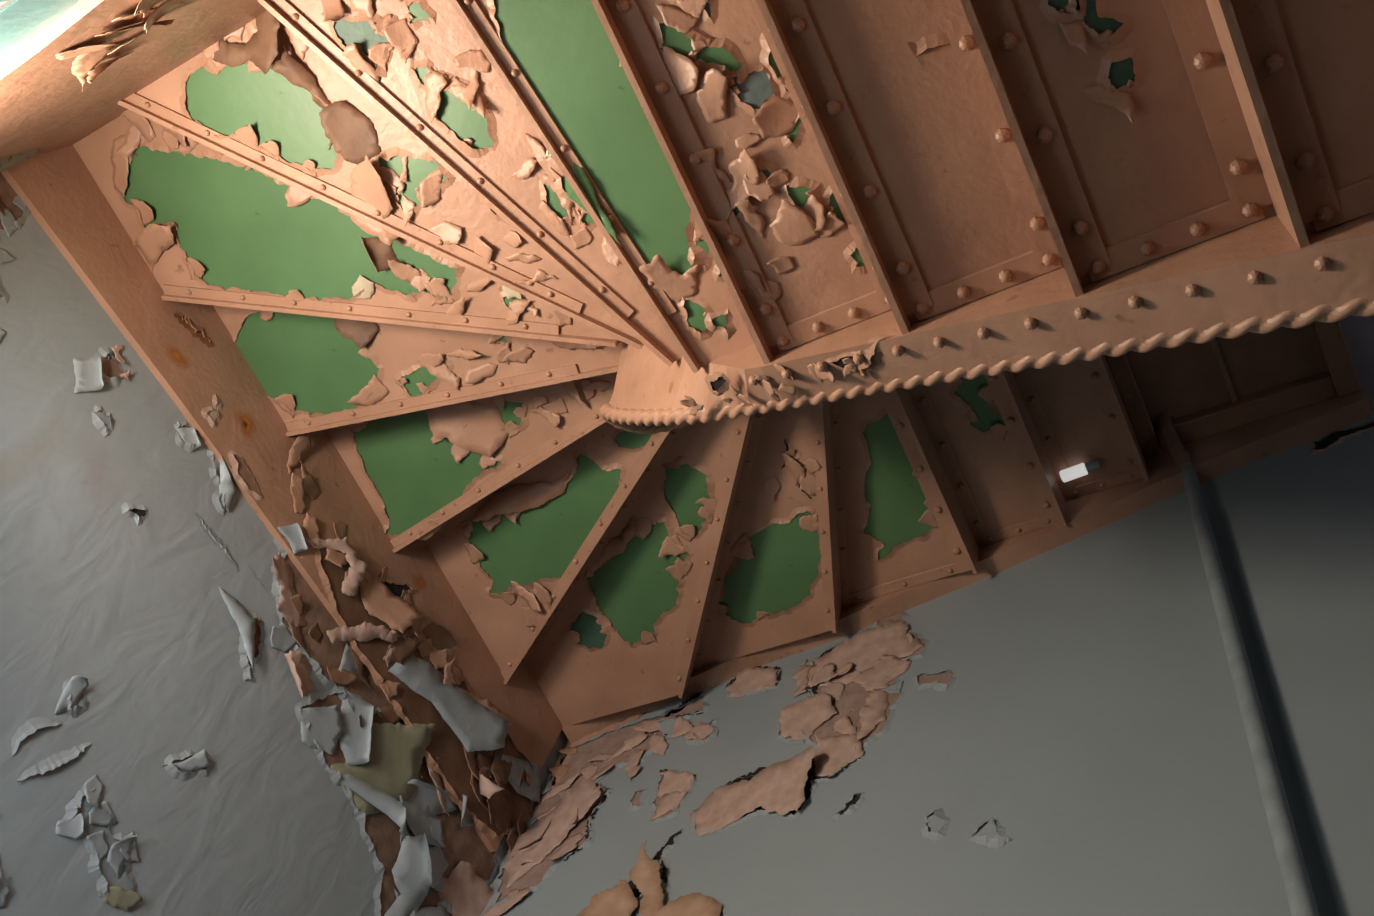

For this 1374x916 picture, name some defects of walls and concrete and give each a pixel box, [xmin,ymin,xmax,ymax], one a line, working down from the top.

peeling [56,0,184,92]
peeling [1039,0,1146,124]
peeling [0,172,31,305]
peeling [73,344,131,437]
peeling [110,0,957,916]
peeling [948,374,1008,442]
peeling [54,675,90,718]
peeling [55,774,143,911]